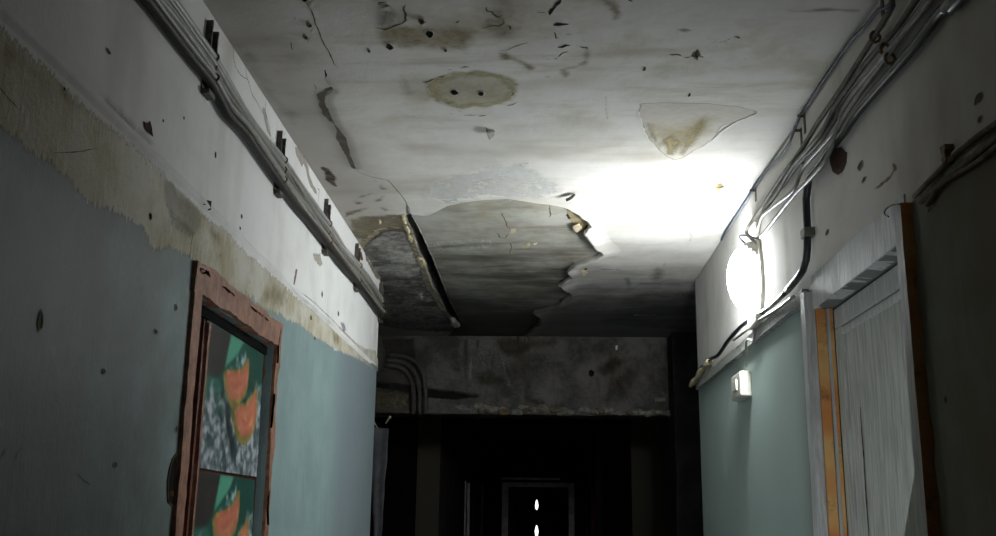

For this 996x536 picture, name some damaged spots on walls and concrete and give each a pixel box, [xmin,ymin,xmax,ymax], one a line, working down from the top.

crack [291,0,339,88]
crack [374,2,407,30]
water stain [424,66,517,108]
crack [537,0,561,15]
flaking render [0,26,378,372]
peeling [317,70,621,336]